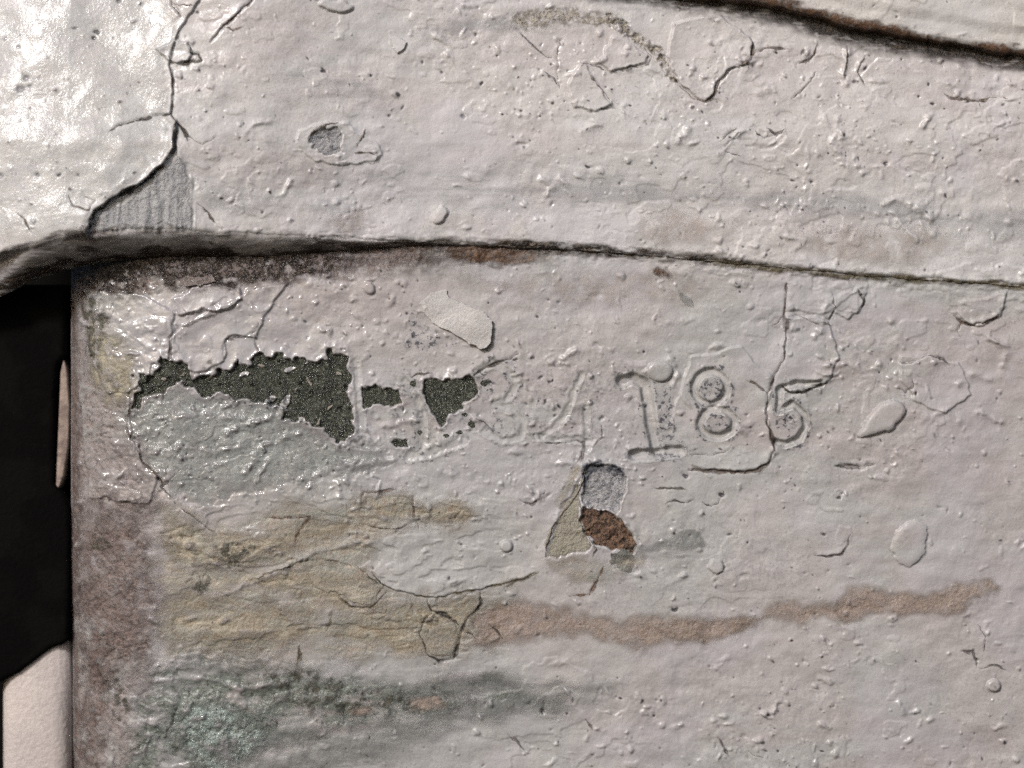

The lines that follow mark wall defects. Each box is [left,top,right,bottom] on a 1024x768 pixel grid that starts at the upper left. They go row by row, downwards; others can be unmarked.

peeling [93,157,193,231]
crack [68,0,252,230]
peeling [309,122,342,155]
peeling [132,349,402,505]
peeling [410,376,491,438]
peeling [420,289,493,349]
crack [305,238,1024,506]
leakage [0,246,559,768]
peeling [545,460,641,580]